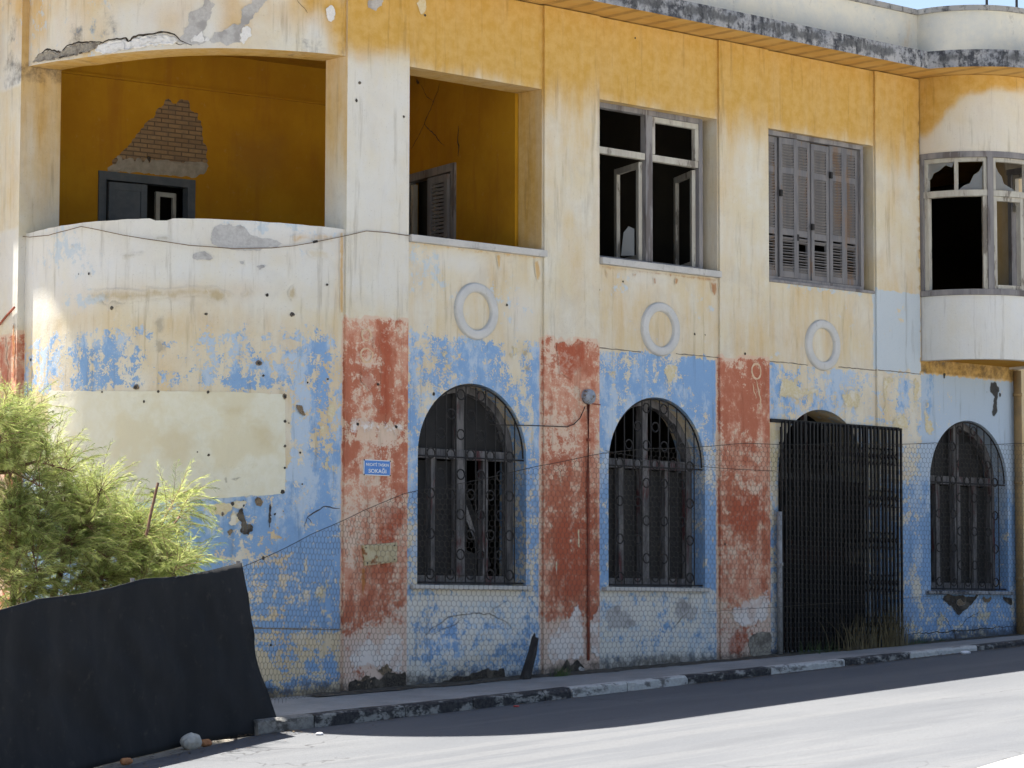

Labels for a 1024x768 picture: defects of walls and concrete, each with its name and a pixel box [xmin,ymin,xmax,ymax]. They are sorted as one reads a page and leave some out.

peeling [33,0,267,63]
damp [681,4,739,26]
damp [755,17,913,58]
damp [932,51,969,66]
damp [1002,50,1024,65]
flaking render [108,99,209,178]
peeling [192,223,282,265]
peeling [664,363,677,385]
peeling [751,363,761,410]
peeling [210,497,284,535]
spalling [937,594,1012,625]